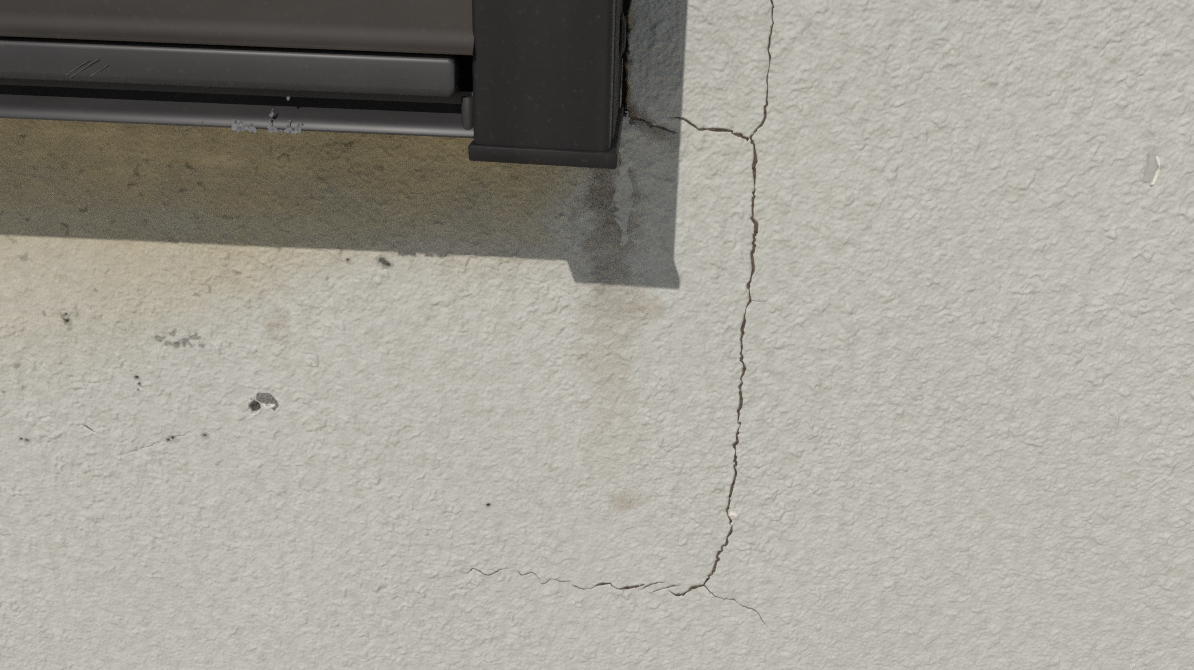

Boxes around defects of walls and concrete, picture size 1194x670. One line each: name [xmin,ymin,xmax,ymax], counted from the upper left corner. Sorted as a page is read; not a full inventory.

crack [461,0,774,627]